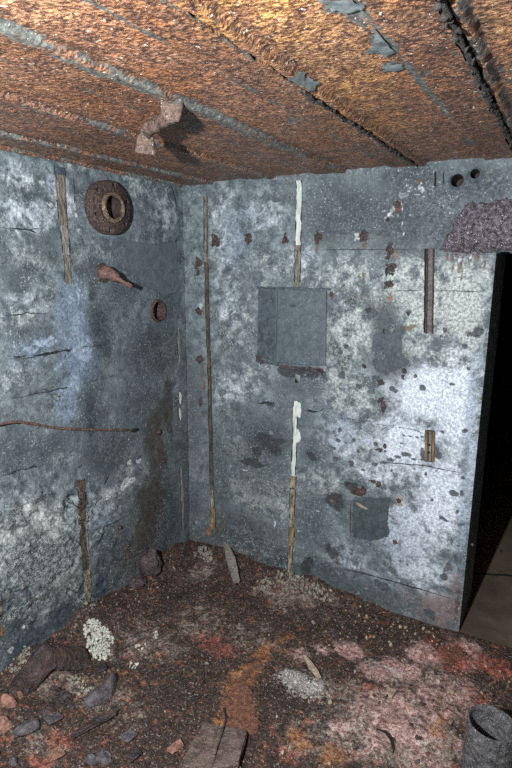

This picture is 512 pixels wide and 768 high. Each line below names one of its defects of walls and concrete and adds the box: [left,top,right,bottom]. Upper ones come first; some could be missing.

peeling [318,0,364,14]
peeling [364,28,403,72]
peeling [288,71,320,104]
corrosion [446,251,486,280]
crack [13,344,100,359]
crack [1,378,103,401]